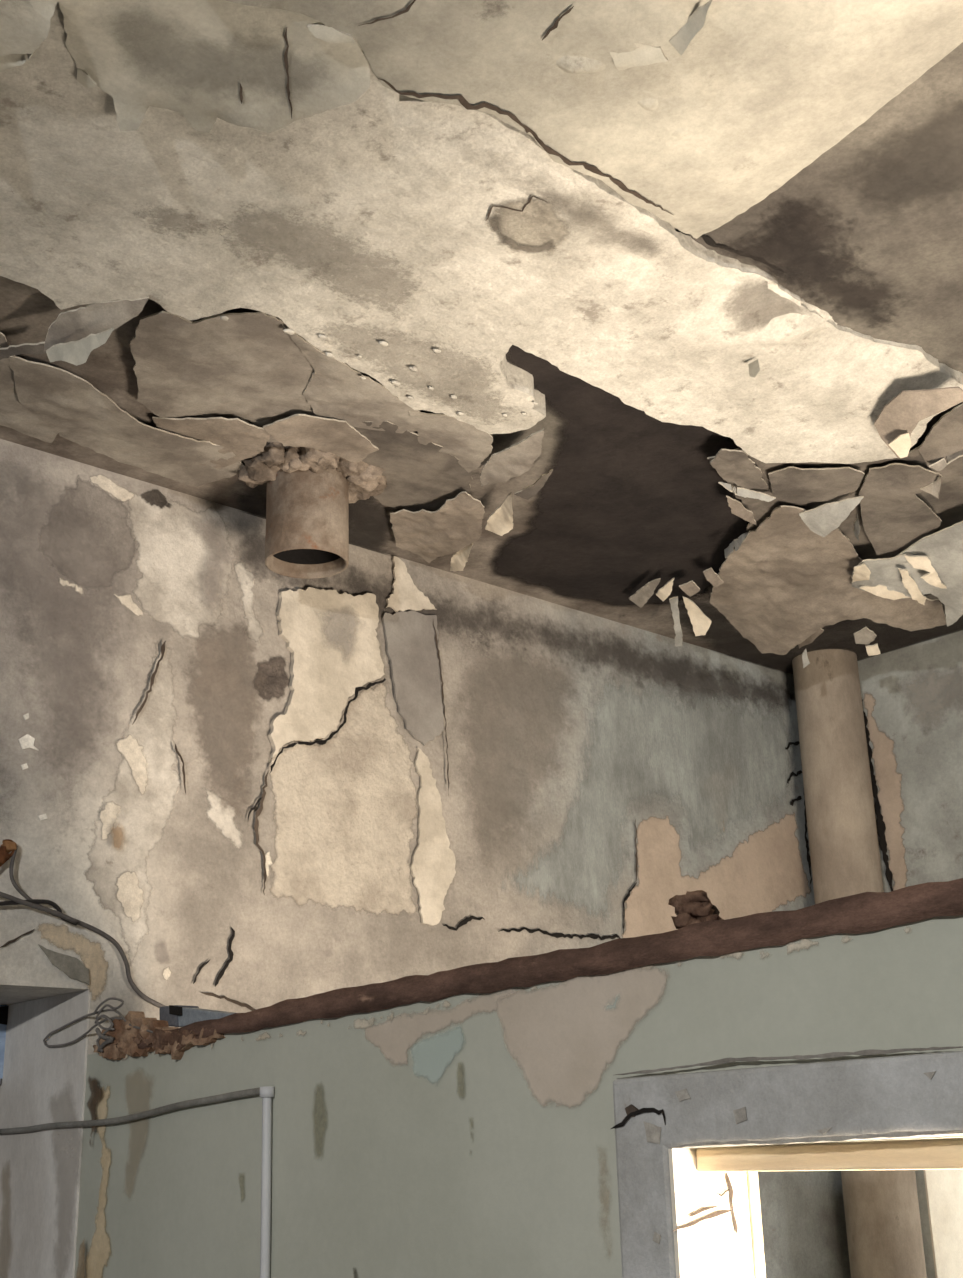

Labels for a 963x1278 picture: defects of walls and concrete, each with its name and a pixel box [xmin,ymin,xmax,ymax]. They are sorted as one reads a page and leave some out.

crack [359,0,416,26]
crack [542,6,574,40]
crack [378,78,779,270]
damp [732,202,890,323]
flaking render [0,0,963,963]
damp [253,657,290,700]
damp [344,569,794,915]
crack [193,927,256,1011]
peeling [354,964,667,1108]
peeling [76,1077,111,1278]
crack [611,1046,963,1234]